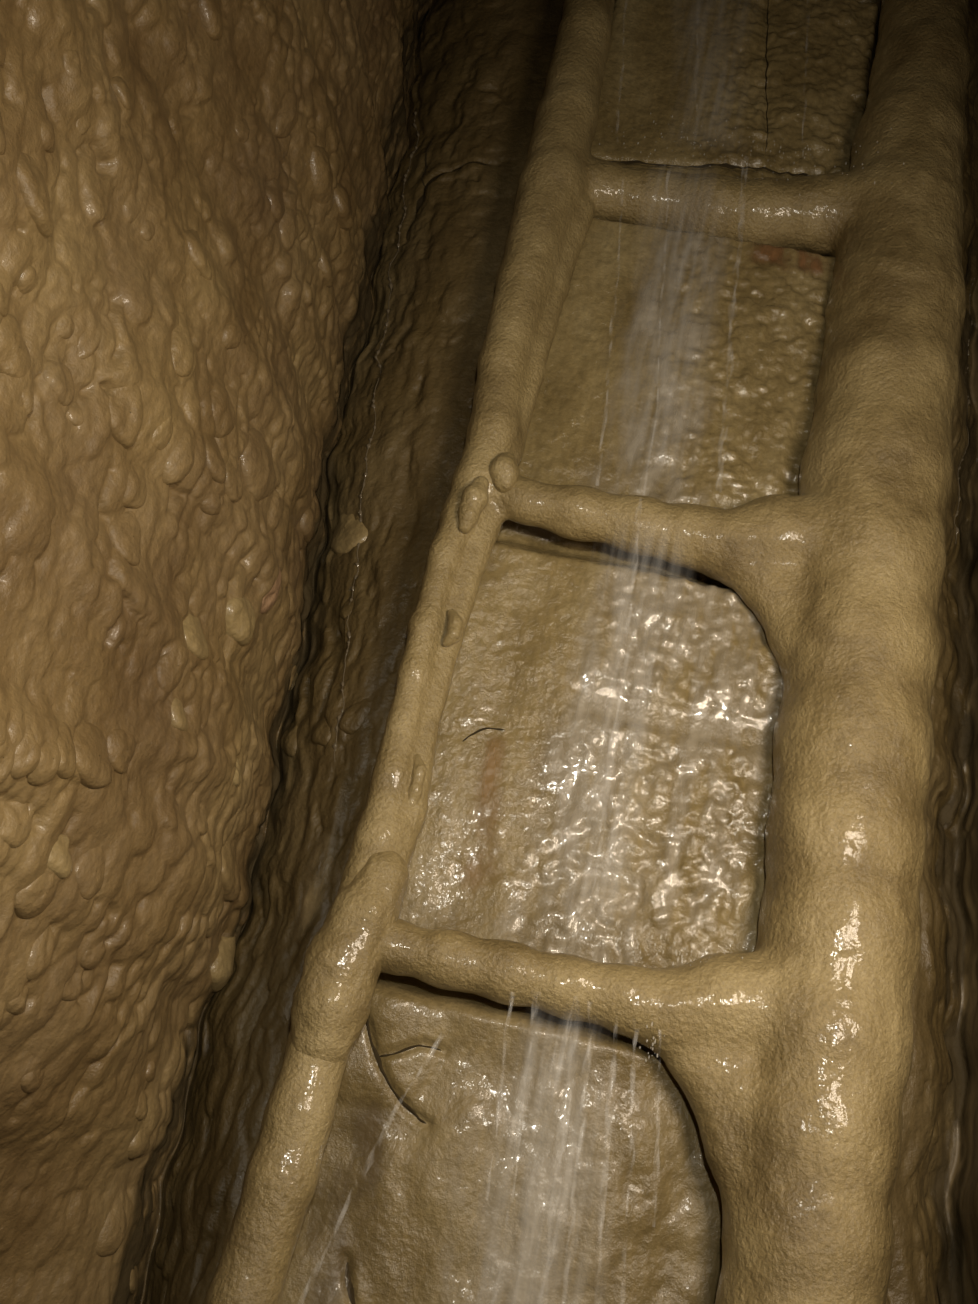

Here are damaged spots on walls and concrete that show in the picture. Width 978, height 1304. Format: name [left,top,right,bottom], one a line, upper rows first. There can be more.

crack [611,0,808,176]
leakage [627,427,682,503]
leakage [552,556,753,873]
leakage [557,852,613,953]
leakage [665,831,681,896]
leakage [487,1059,578,1304]